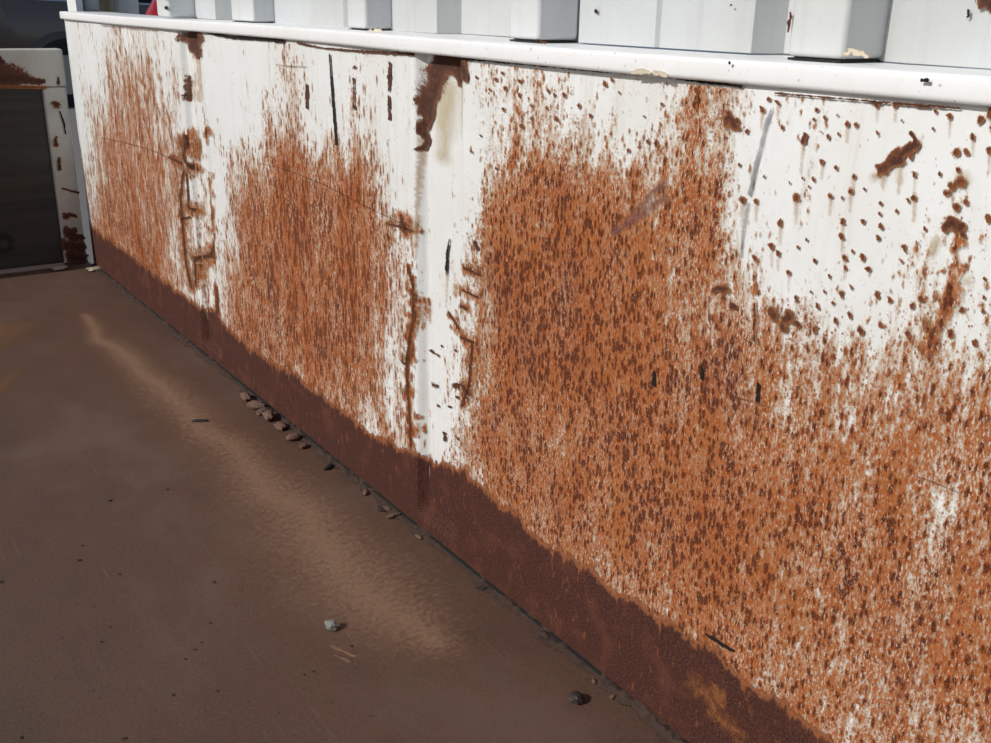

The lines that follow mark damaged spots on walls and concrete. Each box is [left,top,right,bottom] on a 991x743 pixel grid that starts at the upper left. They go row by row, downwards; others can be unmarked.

corrosion [966,0,991,18]
corrosion [170,31,204,59]
corrosion [0,56,60,89]
corrosion [376,61,391,120]
corrosion [413,55,469,156]
corrosion [788,96,858,225]
corrosion [875,131,920,178]
corrosion [951,133,975,157]
corrosion [943,167,968,213]
corrosion [186,176,211,256]
corrosion [61,226,89,264]
corrosion [841,249,871,276]